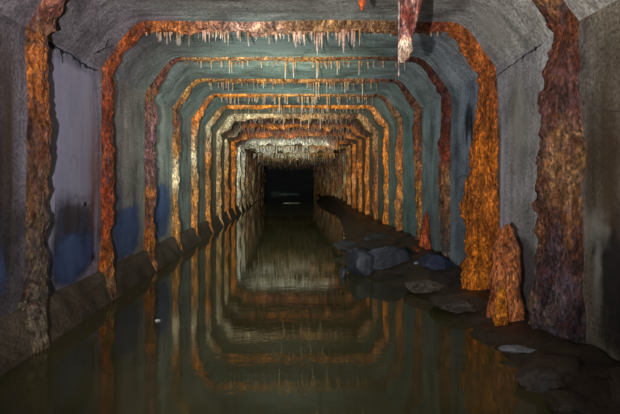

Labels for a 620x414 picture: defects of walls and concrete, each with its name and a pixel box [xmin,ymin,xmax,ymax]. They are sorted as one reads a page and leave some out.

rust [17,0,66,354]
leakage [46,55,98,283]
crack [48,39,113,71]
leakage [115,207,140,256]
leakage [154,184,170,236]
rust [98,20,451,299]
rust [414,21,500,290]
crack [497,43,543,76]
rust [526,0,587,344]